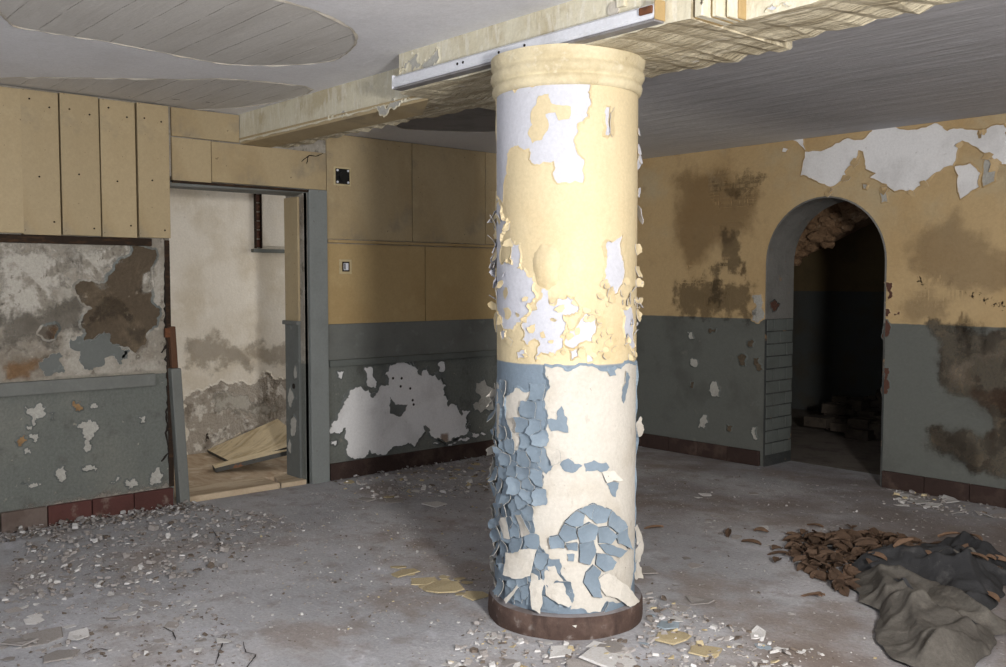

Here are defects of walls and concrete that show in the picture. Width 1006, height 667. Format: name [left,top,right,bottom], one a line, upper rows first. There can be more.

spalling [764,1,792,13]
peeling [782,122,1006,266]
spalling [72,246,162,355]
peeling [329,84,658,614]
peeling [14,401,47,455]
peeling [71,400,101,473]
leakage [925,318,1006,478]
peeling [53,465,68,484]
peeling [109,466,164,490]